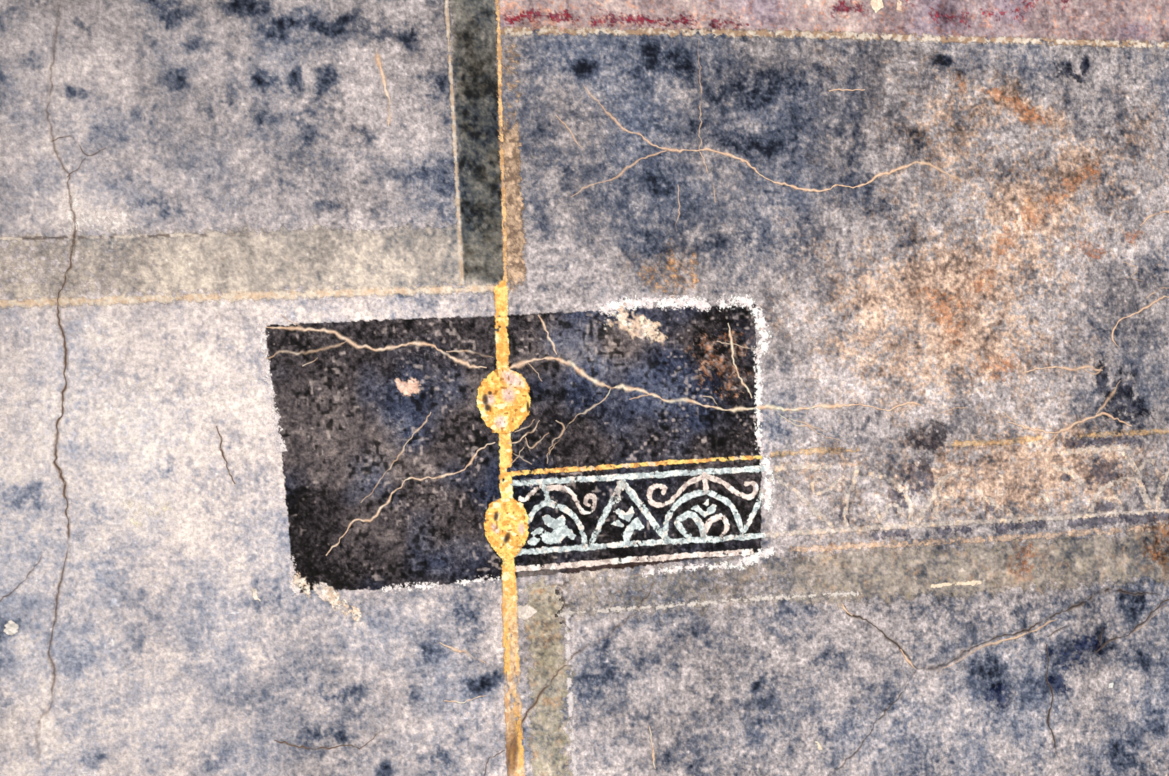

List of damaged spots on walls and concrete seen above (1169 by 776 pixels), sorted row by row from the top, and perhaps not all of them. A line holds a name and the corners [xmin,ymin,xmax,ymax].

crack [593,106,956,192]
crack [1112,262,1169,346]
crack [48,136,95,685]
crack [266,315,959,556]
crack [1003,366,1132,453]
crack [837,588,1169,769]